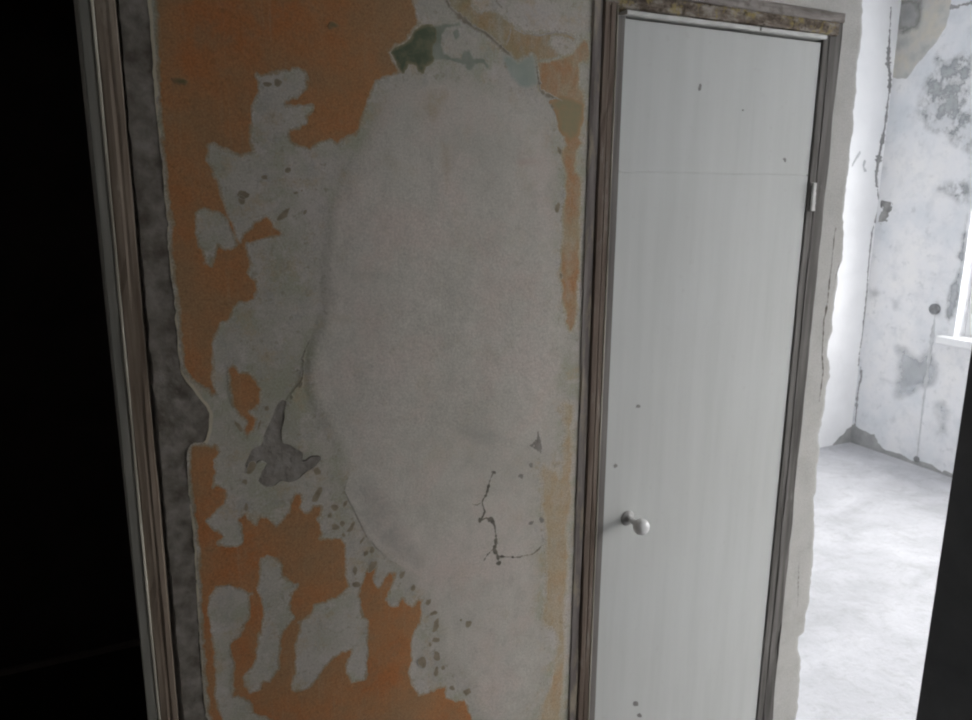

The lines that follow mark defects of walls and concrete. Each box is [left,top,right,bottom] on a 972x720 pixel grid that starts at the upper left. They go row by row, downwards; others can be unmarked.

peeling [391,21,490,74]
peeling [893,0,951,79]
leakage [925,56,970,135]
crack [854,7,892,426]
flaking render [119,0,209,720]
flaking render [242,400,323,502]
crack [473,470,542,566]
peeling [417,599,446,677]